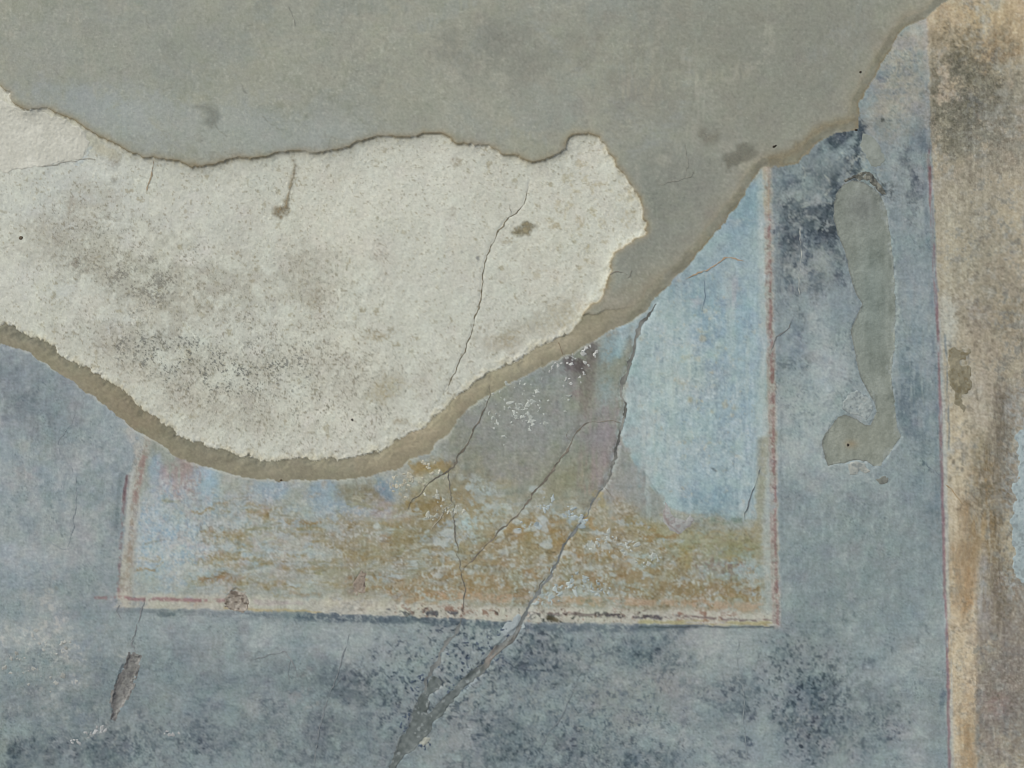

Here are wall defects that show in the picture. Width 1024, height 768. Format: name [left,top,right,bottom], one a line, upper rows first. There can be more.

spalling [844,171,886,194]
crack [448,186,529,386]
peeling [478,345,598,446]
crack [408,304,656,690]
peeling [562,506,588,529]
spalling [70,652,142,746]